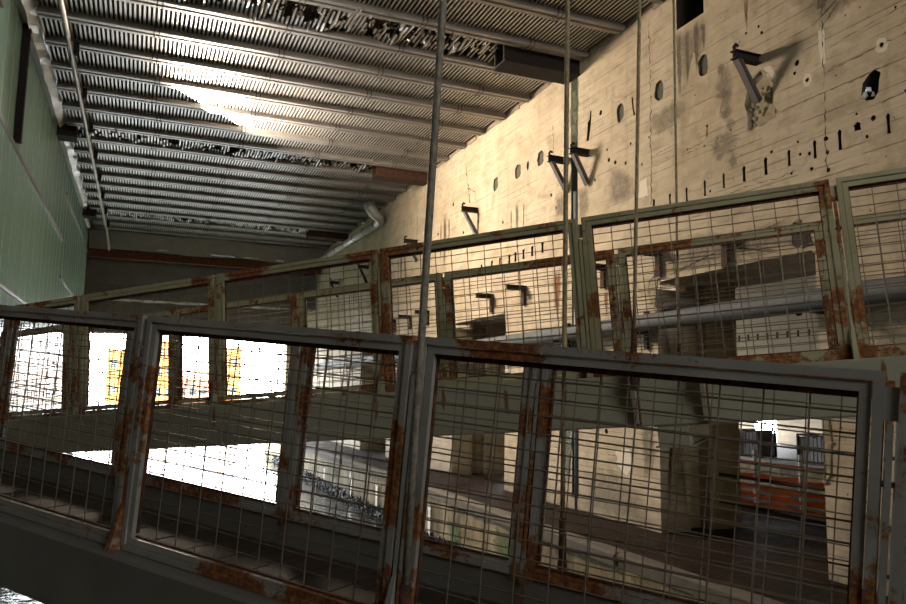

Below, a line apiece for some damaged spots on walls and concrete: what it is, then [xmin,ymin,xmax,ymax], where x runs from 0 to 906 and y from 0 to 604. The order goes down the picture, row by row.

water stain [677,27,705,88]
water stain [714,66,735,167]
spalling [744,70,777,132]